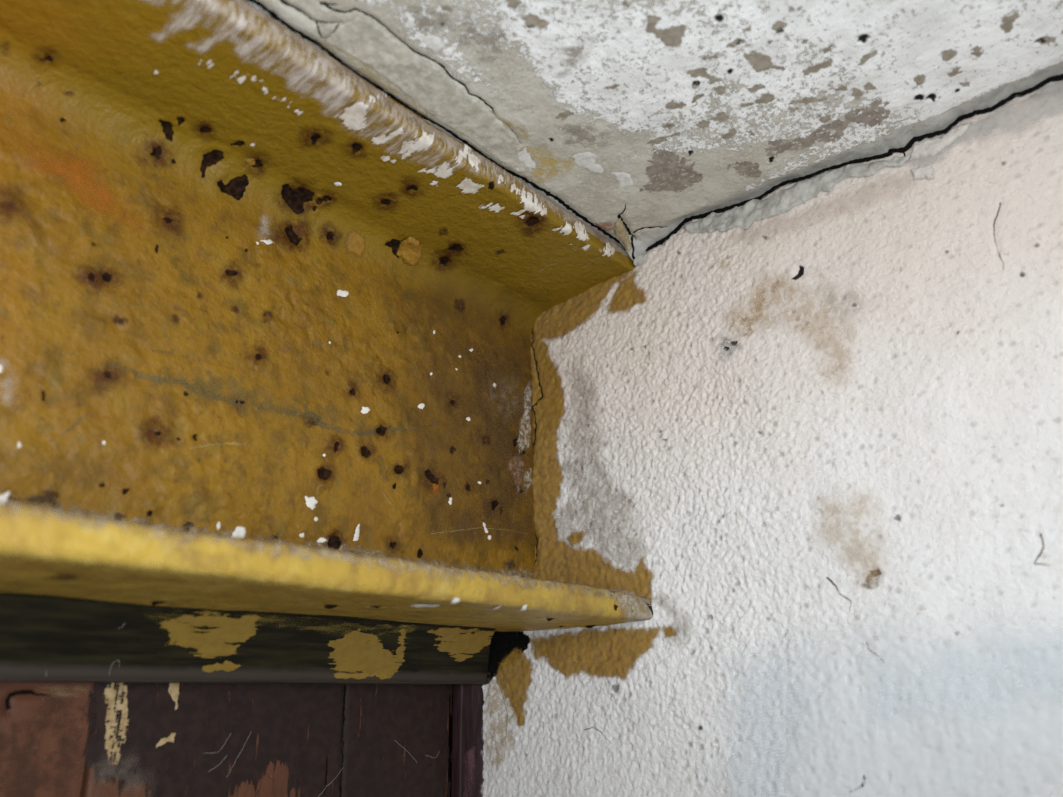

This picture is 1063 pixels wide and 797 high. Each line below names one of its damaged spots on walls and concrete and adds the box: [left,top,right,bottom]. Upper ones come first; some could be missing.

peeling [507,0,550,28]
crack [248,0,1063,267]
rust [150,142,176,165]
rust [520,212,545,235]
rust [435,228,464,269]
rust [319,467,333,481]
rust [326,534,342,549]
peeling [612,593,653,622]
peeling [202,660,241,673]
peeling [168,683,179,710]
peeling [104,683,129,765]
peeling [156,733,176,748]